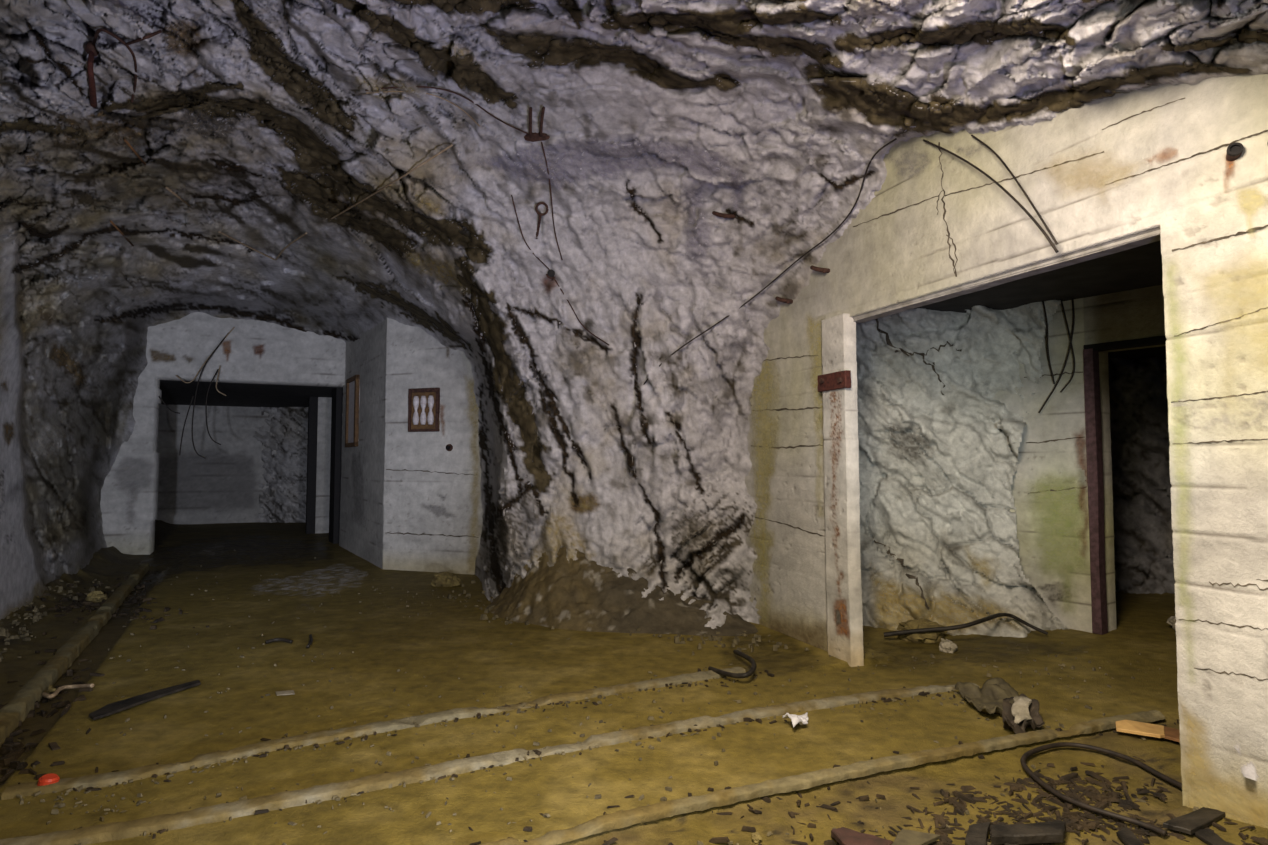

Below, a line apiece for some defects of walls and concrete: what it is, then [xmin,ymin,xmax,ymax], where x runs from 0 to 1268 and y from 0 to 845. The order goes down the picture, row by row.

crack [1105,130,1268,185]
crack [853,98,1185,277]
crack [1172,225,1268,252]
crack [1209,579,1268,591]
rust [835,600,849,636]
crack [1179,619,1267,631]
crack [1195,668,1266,681]